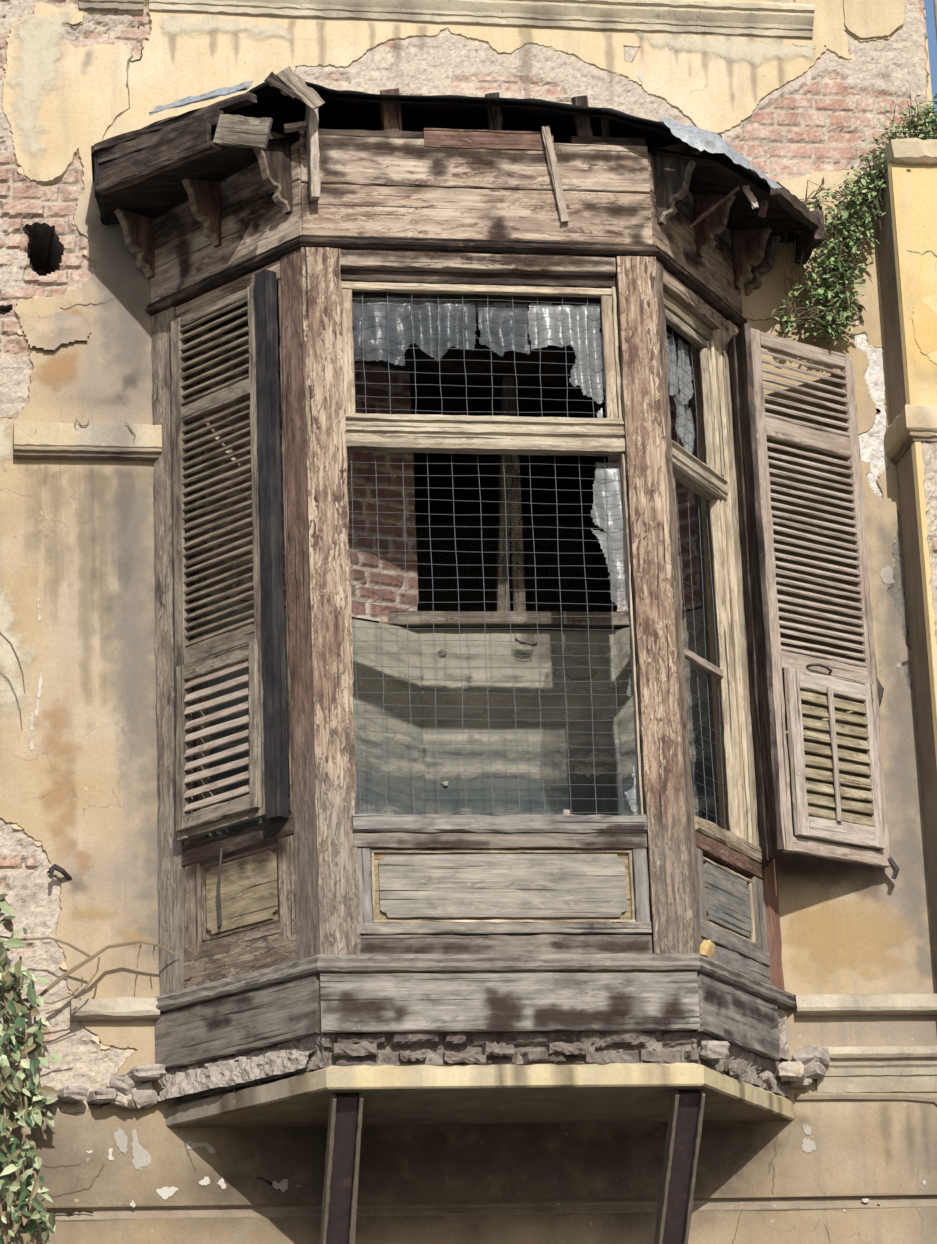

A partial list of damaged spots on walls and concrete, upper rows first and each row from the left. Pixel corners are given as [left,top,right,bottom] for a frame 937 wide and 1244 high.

water stain [162,16,291,39]
spalling [294,29,694,126]
spalling [720,0,928,183]
spalling [0,0,150,420]
peeling [852,303,889,497]
water stain [0,594,34,705]
spalling [880,510,912,688]
spalling [921,442,937,644]
spalling [0,819,831,1114]
peeling [108,1127,151,1171]
peeling [156,1187,178,1200]
peeling [199,1176,226,1189]